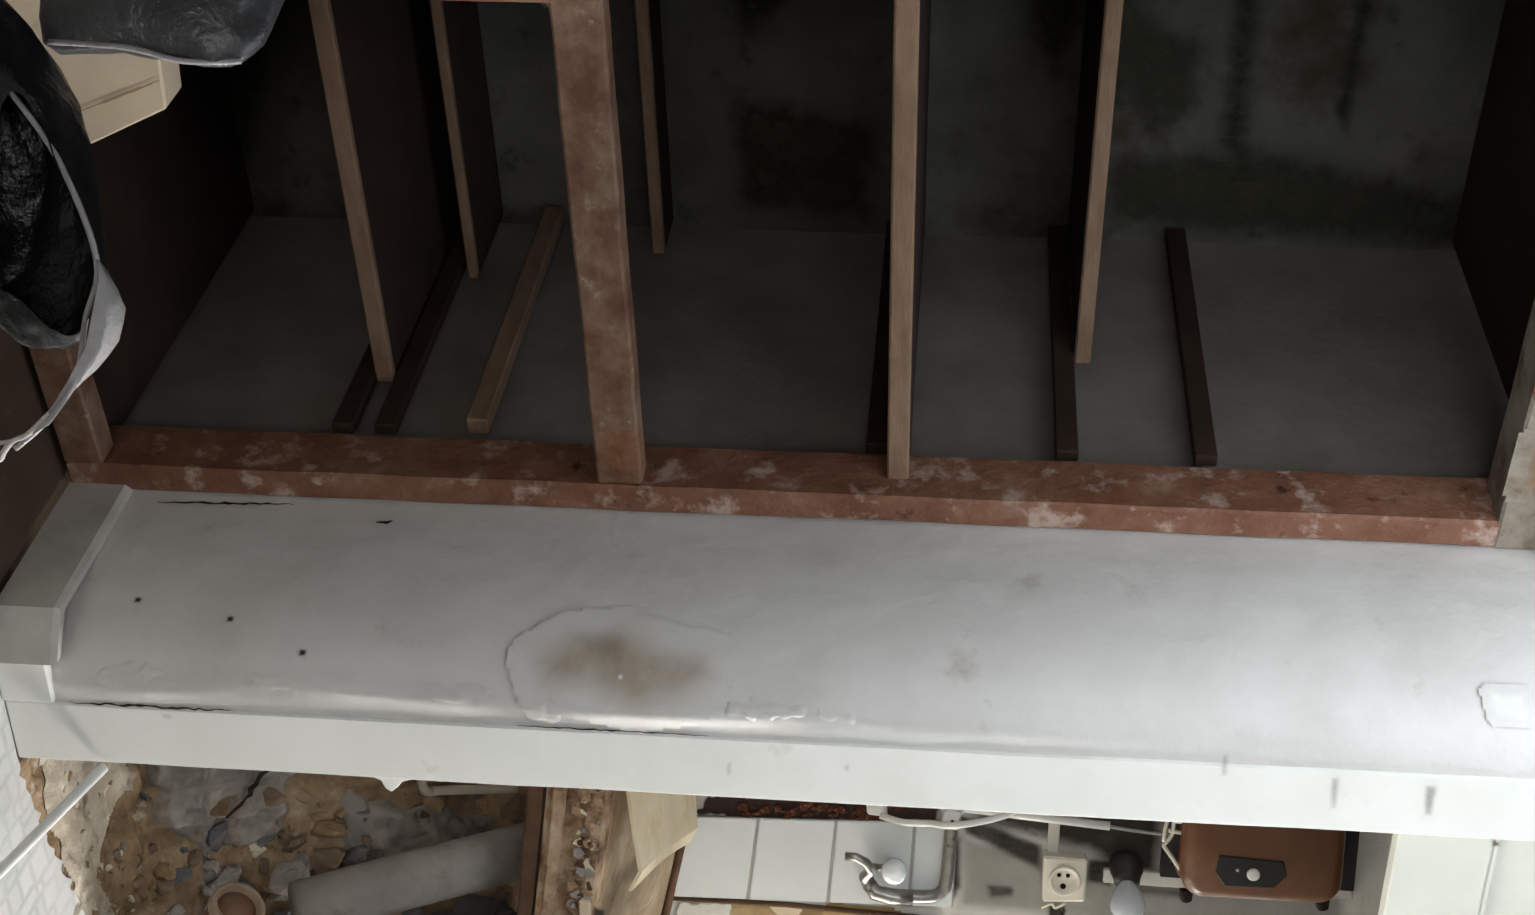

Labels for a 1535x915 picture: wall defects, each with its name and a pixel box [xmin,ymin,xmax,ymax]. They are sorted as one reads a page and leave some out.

rust [1502,429,1535,504]
water stain [506,606,743,734]
spalling [249,841,267,858]
peeling [533,787,612,915]